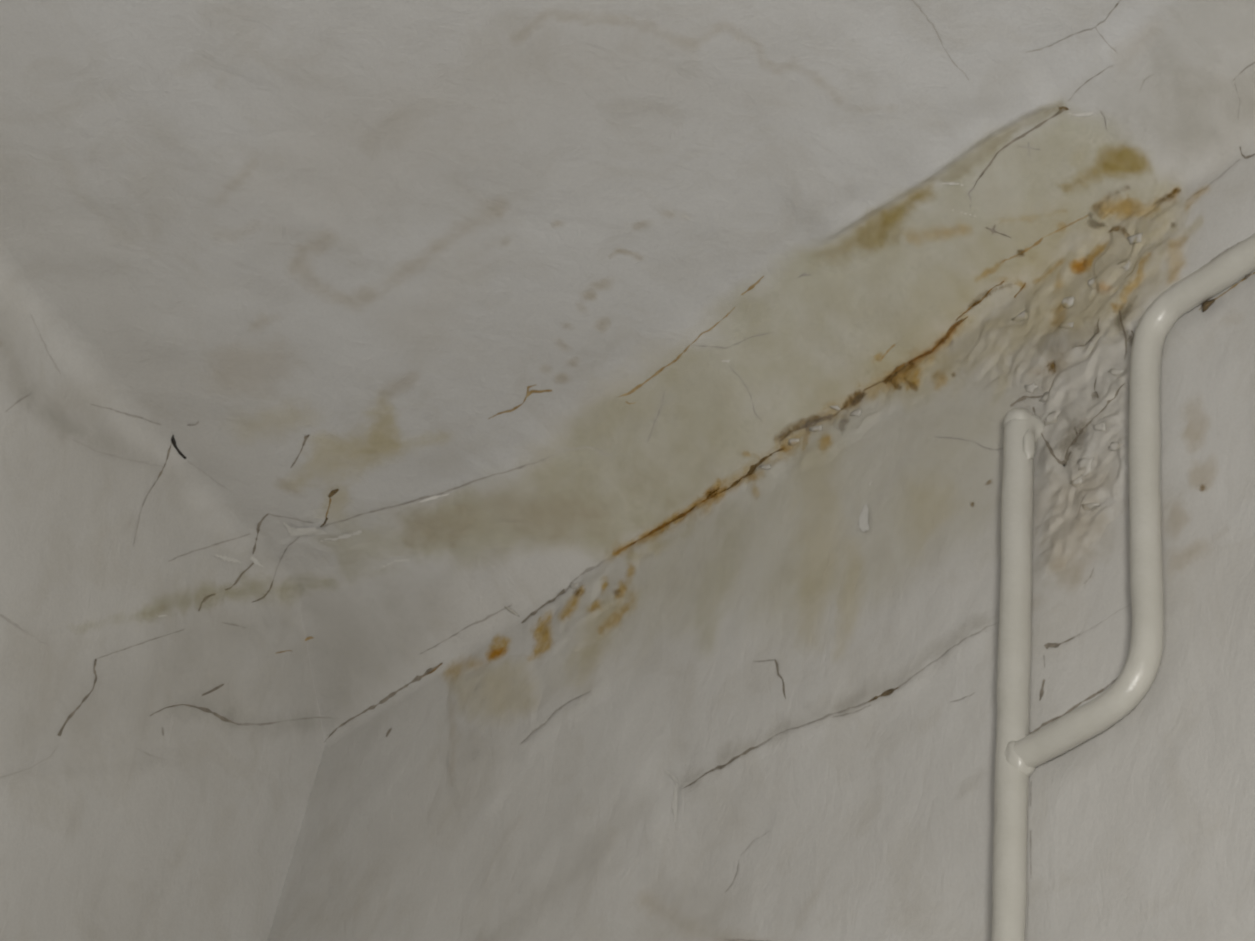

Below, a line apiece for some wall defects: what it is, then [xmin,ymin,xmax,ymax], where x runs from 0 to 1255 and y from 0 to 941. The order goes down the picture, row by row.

crack [1177,62,1255,205]
crack [1199,272,1255,310]
crack [136,0,1134,759]
crack [62,404,233,547]
crack [0,447,613,778]
crack [684,622,998,788]
crack [1030,708,1135,874]